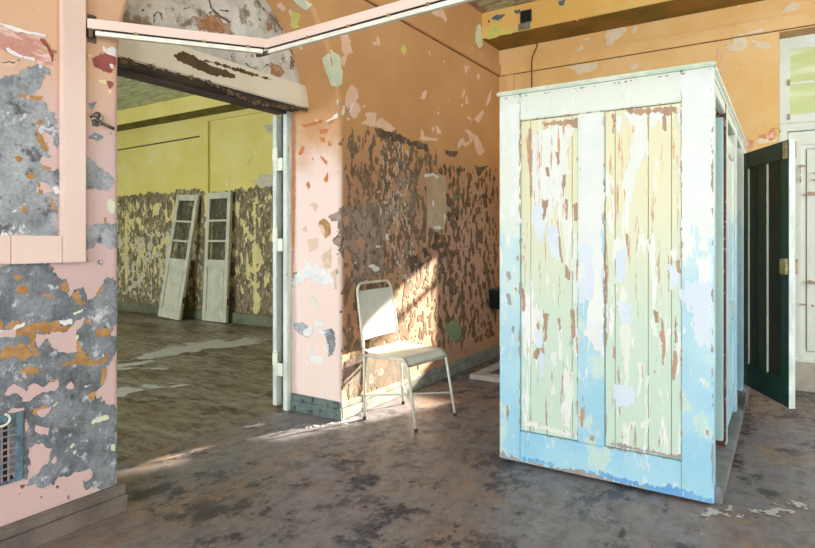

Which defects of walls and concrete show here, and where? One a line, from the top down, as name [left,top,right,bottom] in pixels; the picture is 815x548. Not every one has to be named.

flaking render [192,14,232,35]
peeling [276,0,312,29]
peeling [567,61,598,75]
peeling [605,26,638,46]
peeling [717,28,772,76]
peeling [0,23,59,236]
peeling [89,102,116,141]
peeling [292,34,522,399]
peeling [0,156,273,498]